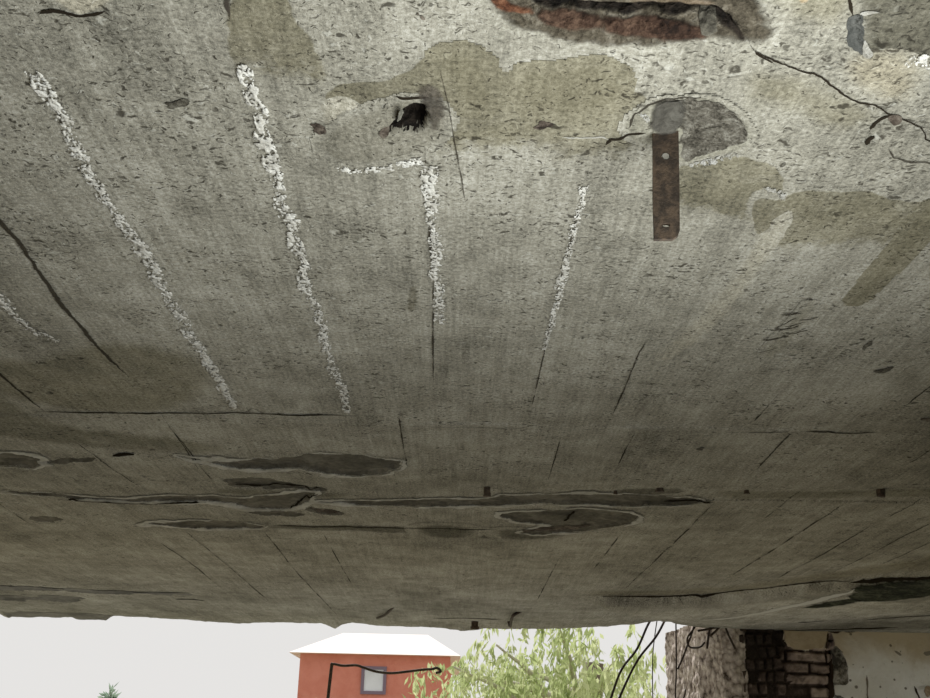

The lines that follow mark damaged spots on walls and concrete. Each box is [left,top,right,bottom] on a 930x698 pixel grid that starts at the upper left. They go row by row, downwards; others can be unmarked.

spalling [491,0,772,46]
peeling [379,107,405,139]
crack [563,97,699,145]
crack [749,41,930,164]
damp [643,153,930,365]
peeling [0,452,712,536]
flaking render [739,629,848,698]